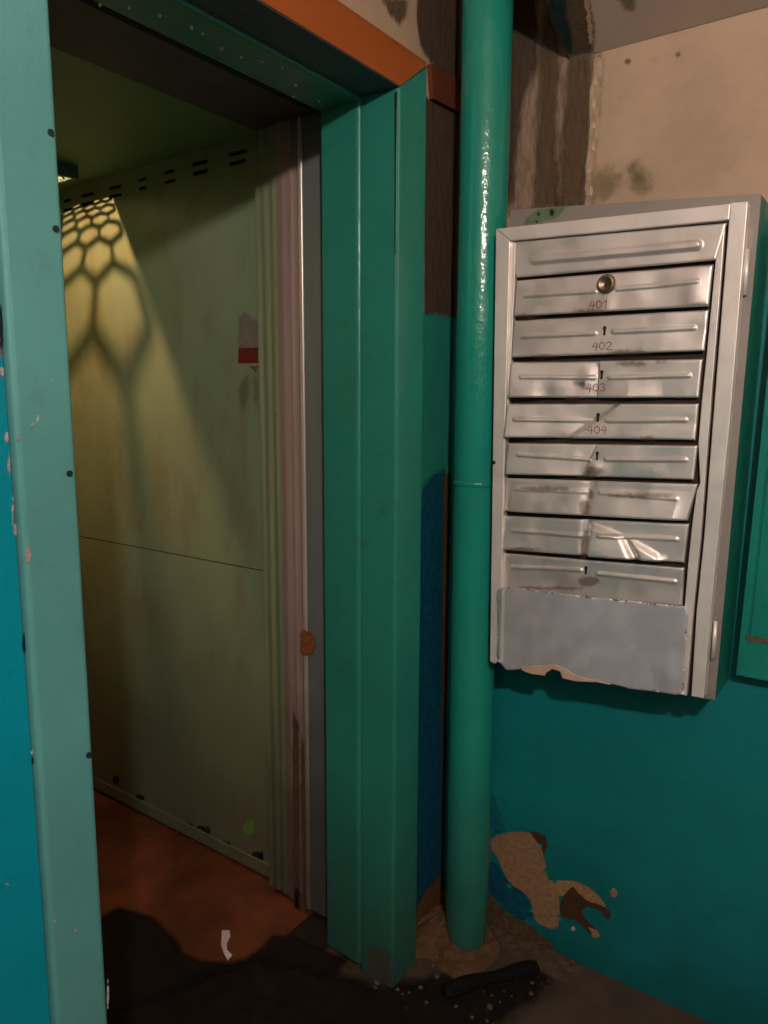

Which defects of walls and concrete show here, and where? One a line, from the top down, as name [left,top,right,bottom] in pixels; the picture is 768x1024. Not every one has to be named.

water stain [508,0,614,214]
corrosion [300,630,315,656]
peeling [487,830,617,950]